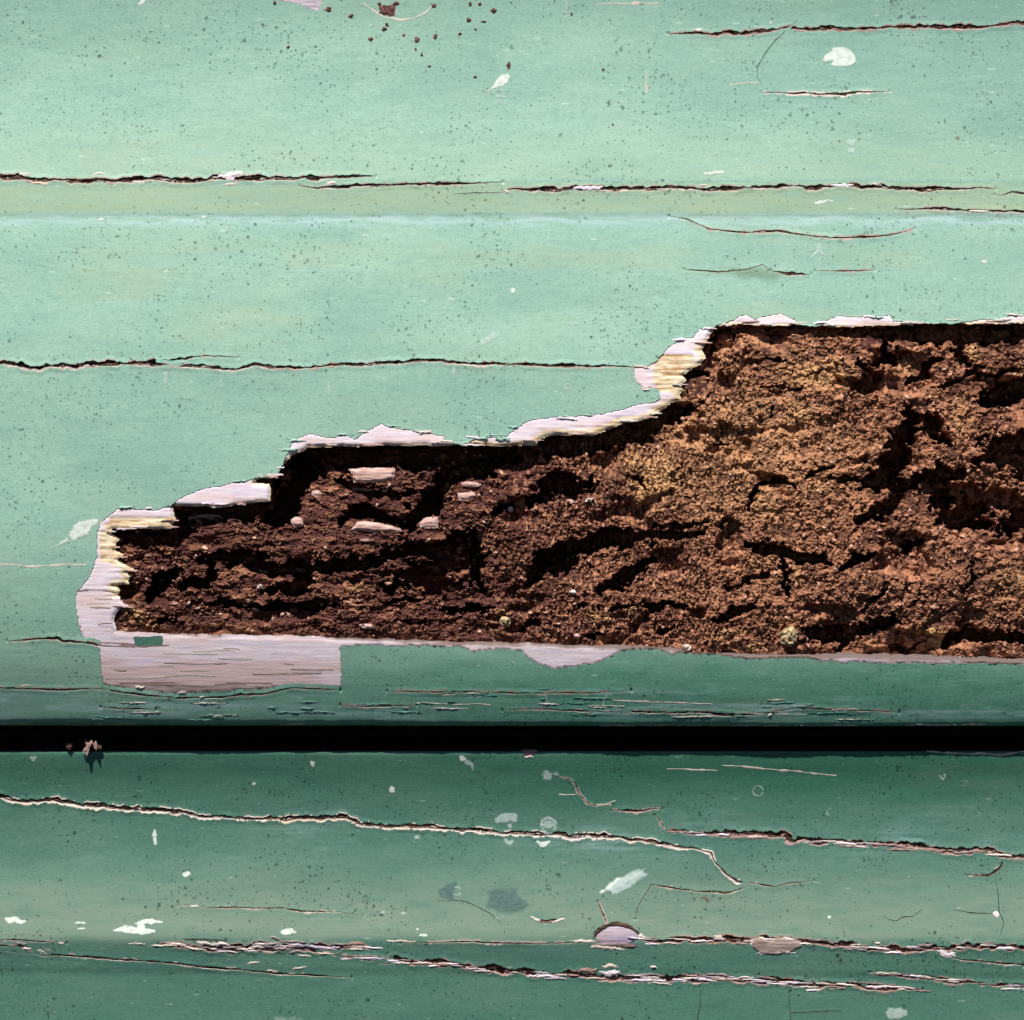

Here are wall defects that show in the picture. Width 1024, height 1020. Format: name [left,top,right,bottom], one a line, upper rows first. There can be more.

rust [368,1,399,41]
crack [669,16,1024,101]
crack [0,169,1024,280]
crack [0,351,635,376]
peeling [76,313,1024,693]
crack [0,683,898,721]
crack [0,774,1024,1020]
peeling [570,921,645,951]
peeling [749,936,802,955]